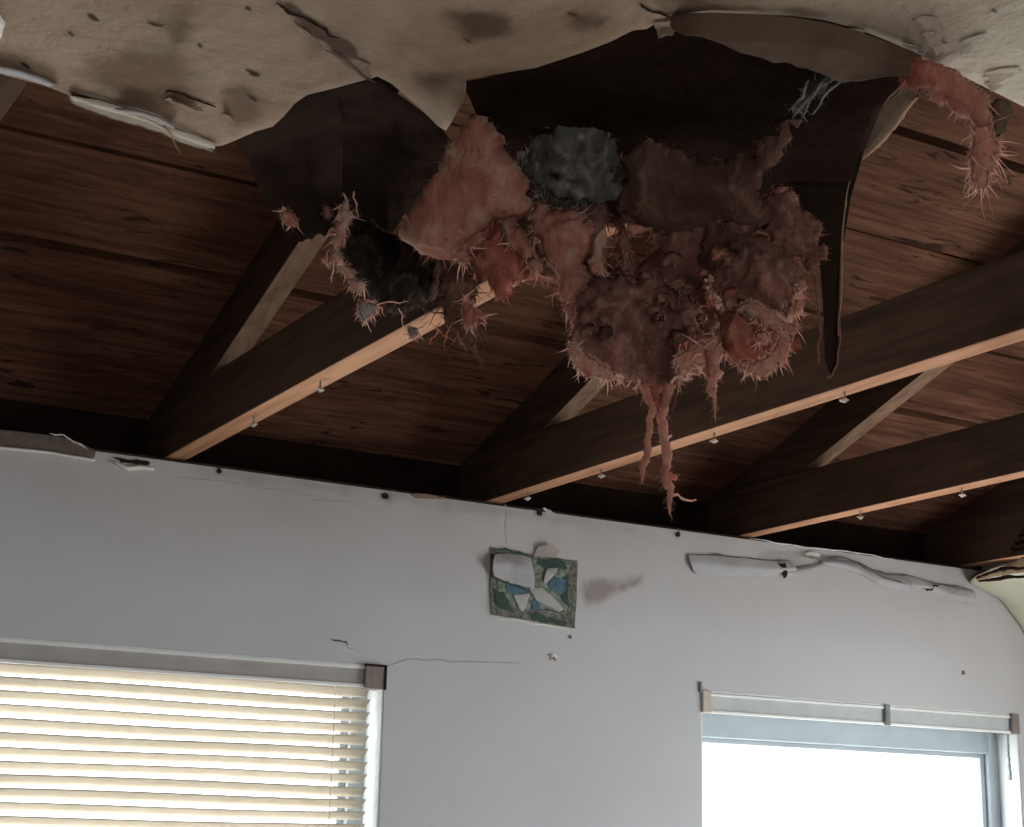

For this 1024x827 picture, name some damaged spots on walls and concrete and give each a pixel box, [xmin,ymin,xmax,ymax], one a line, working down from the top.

damp [460,15,503,36]
peeling [0,430,96,462]
spalling [114,457,154,471]